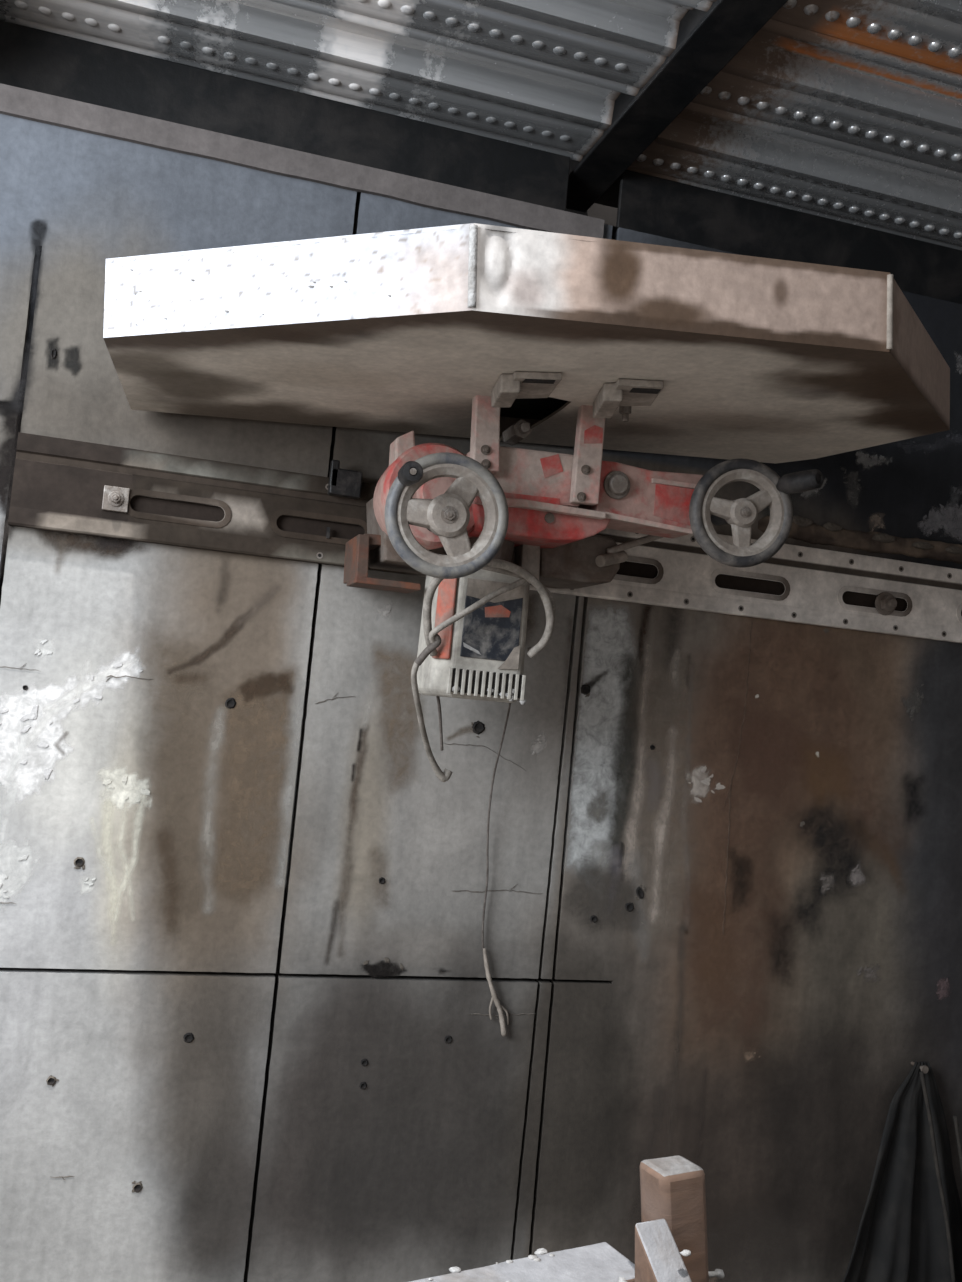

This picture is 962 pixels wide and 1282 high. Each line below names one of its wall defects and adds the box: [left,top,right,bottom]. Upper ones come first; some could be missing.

peeling [842,451,892,506]
peeling [919,487,962,540]
damp [168,593,274,673]
peeling [0,651,143,904]
peeling [99,768,152,809]
damp [568,605,692,938]
peeling [687,766,725,802]
peeling [850,865,865,885]